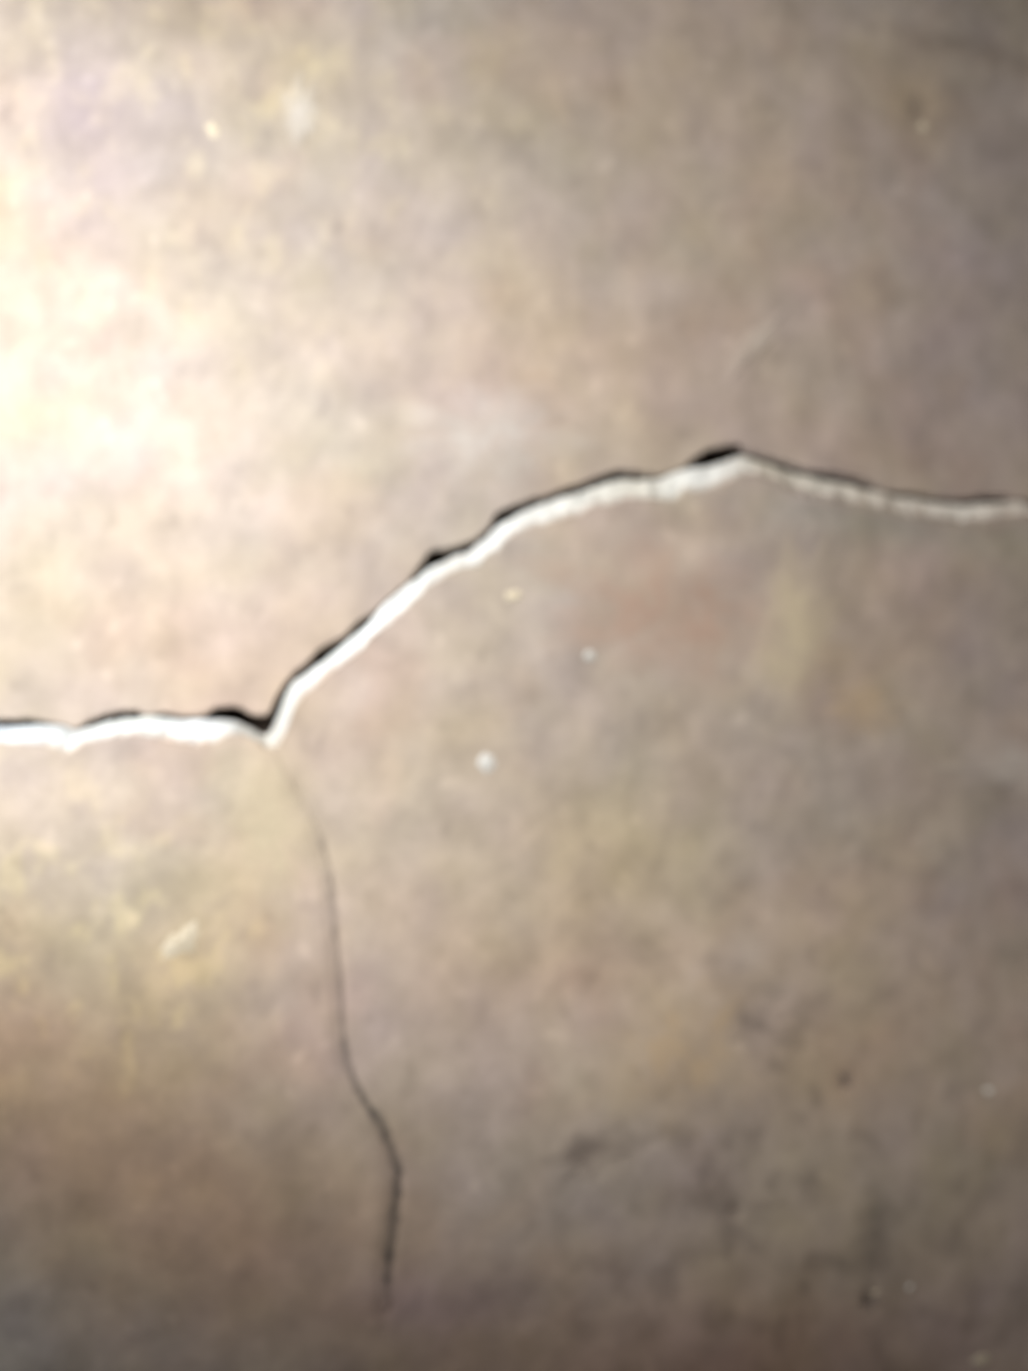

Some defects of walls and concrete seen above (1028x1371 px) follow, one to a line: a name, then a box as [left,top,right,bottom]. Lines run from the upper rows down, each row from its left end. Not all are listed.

crack [0,447,1028,1309]